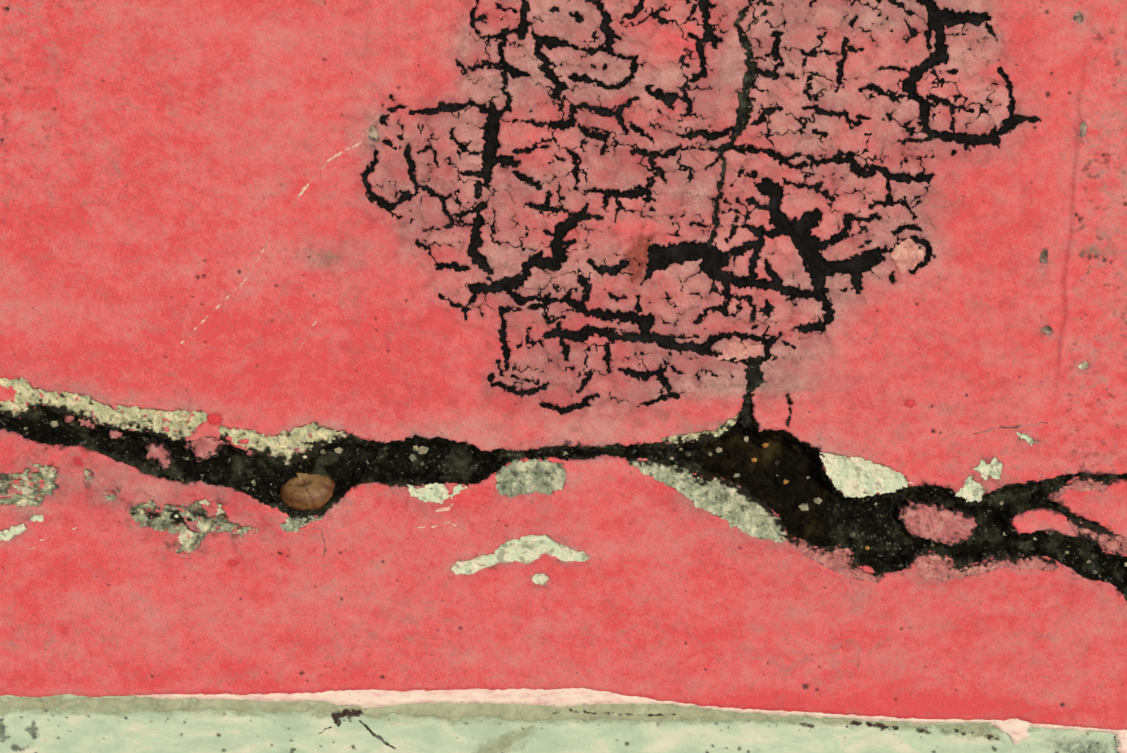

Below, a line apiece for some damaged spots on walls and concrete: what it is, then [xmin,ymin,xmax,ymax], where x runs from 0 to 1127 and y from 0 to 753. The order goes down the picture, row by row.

crack [0,0,1127,601]
flaking render [0,377,207,442]
flaking render [218,422,350,470]
flaking render [0,463,59,541]
flaking render [129,499,259,553]
flaking render [495,459,566,498]
flaking render [451,535,590,585]